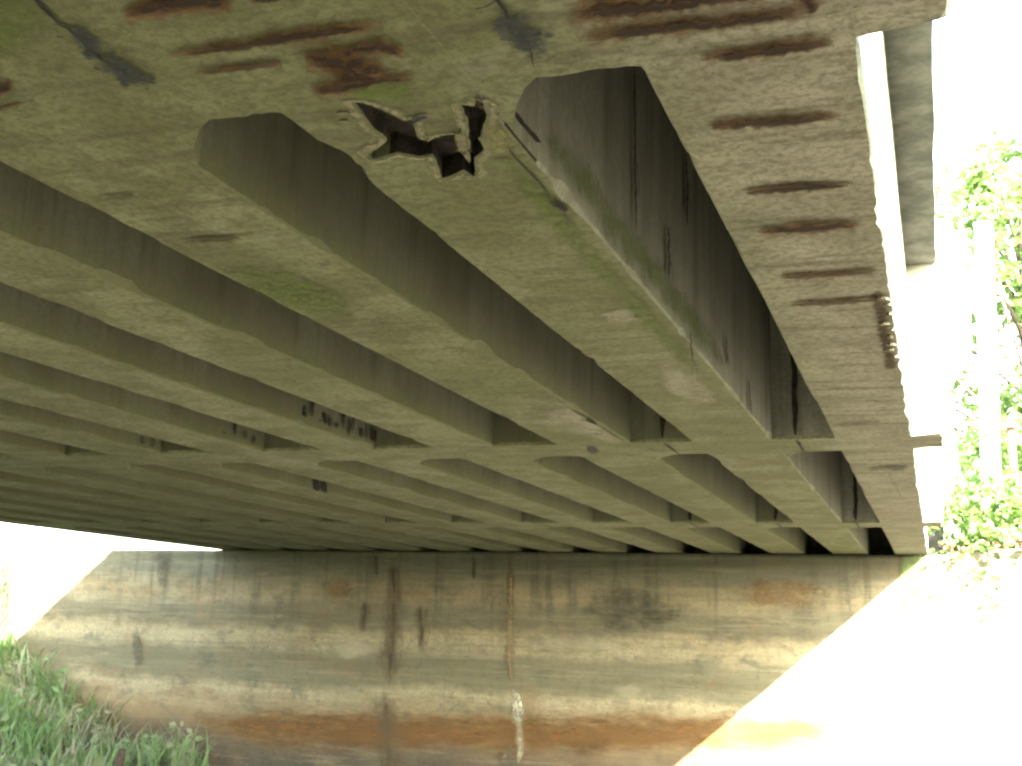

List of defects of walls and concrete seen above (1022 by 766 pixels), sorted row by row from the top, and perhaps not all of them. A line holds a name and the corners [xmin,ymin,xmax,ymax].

rust [124,0,233,24]
crack [477,0,518,27]
rust [567,0,819,44]
crack [34,0,155,84]
rust [169,22,415,97]
rust [702,36,830,62]
spalling [337,97,499,182]
spalling [515,112,542,143]
rust [712,114,835,131]
rust [747,183,848,195]
leakage [503,692,524,766]
rust [207,713,840,751]